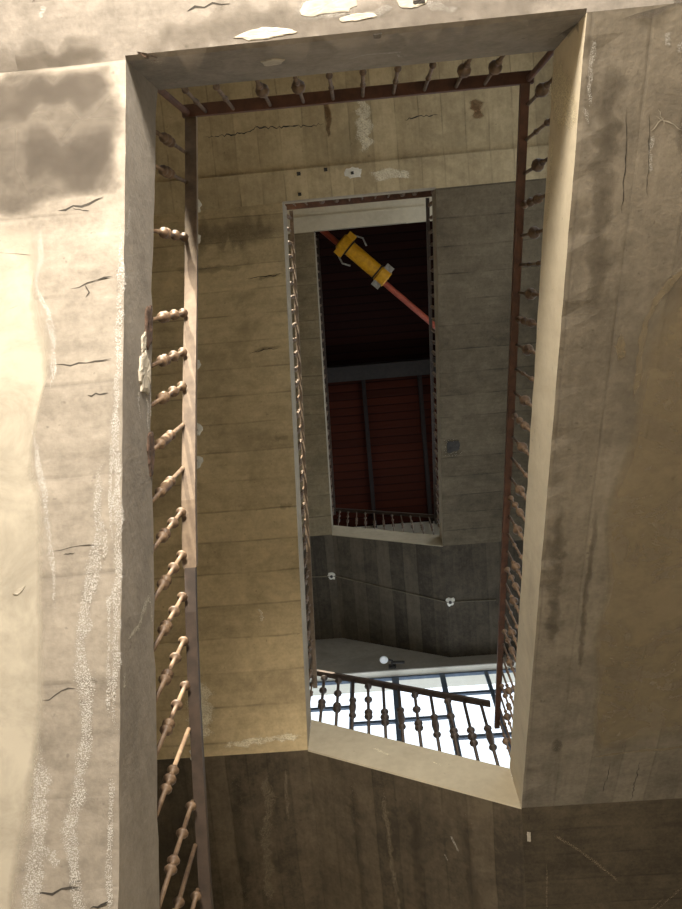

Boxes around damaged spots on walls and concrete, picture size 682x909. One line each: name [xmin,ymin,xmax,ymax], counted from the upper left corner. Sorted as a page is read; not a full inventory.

crack [188,2,230,11]
peeling [296,0,456,22]
peeling [234,27,297,41]
crack [208,123,322,138]
damp [0,73,116,212]
peeling [344,167,410,182]
crack [59,197,102,211]
crack [72,276,112,298]
crack [35,881,108,909]